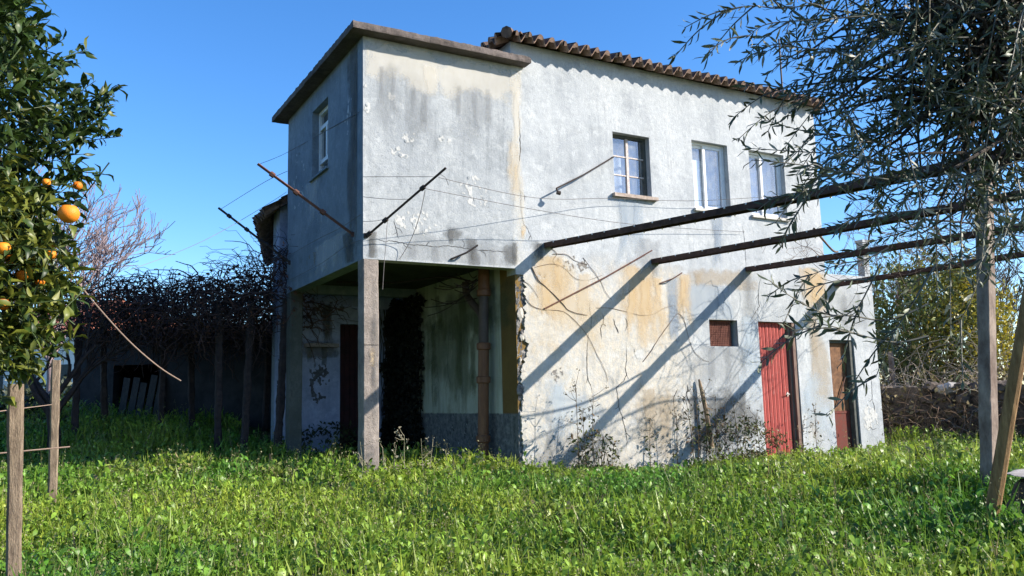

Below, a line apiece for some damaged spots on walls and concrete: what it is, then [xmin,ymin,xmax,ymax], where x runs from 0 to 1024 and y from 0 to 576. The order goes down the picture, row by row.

peeling [394,210,437,236]
flaking render [515,272,549,466]